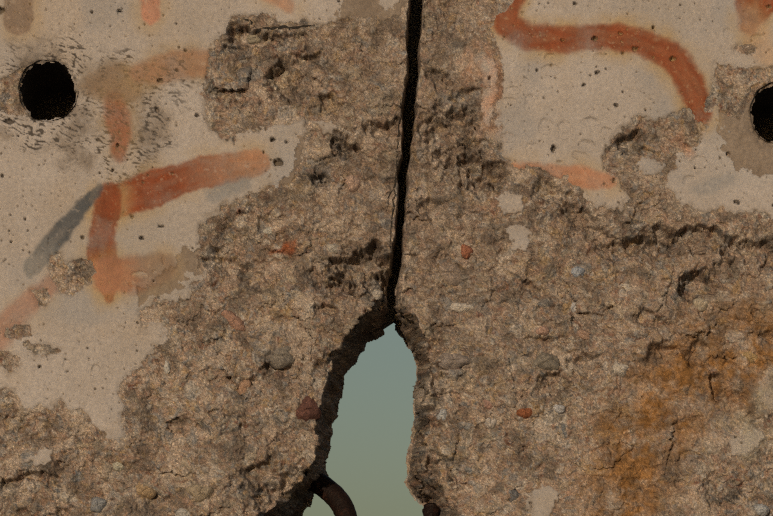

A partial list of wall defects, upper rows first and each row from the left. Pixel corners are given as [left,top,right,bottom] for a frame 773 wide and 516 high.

spalling [0,0,412,516]
crack [386,99,402,249]
spalling [393,0,773,516]